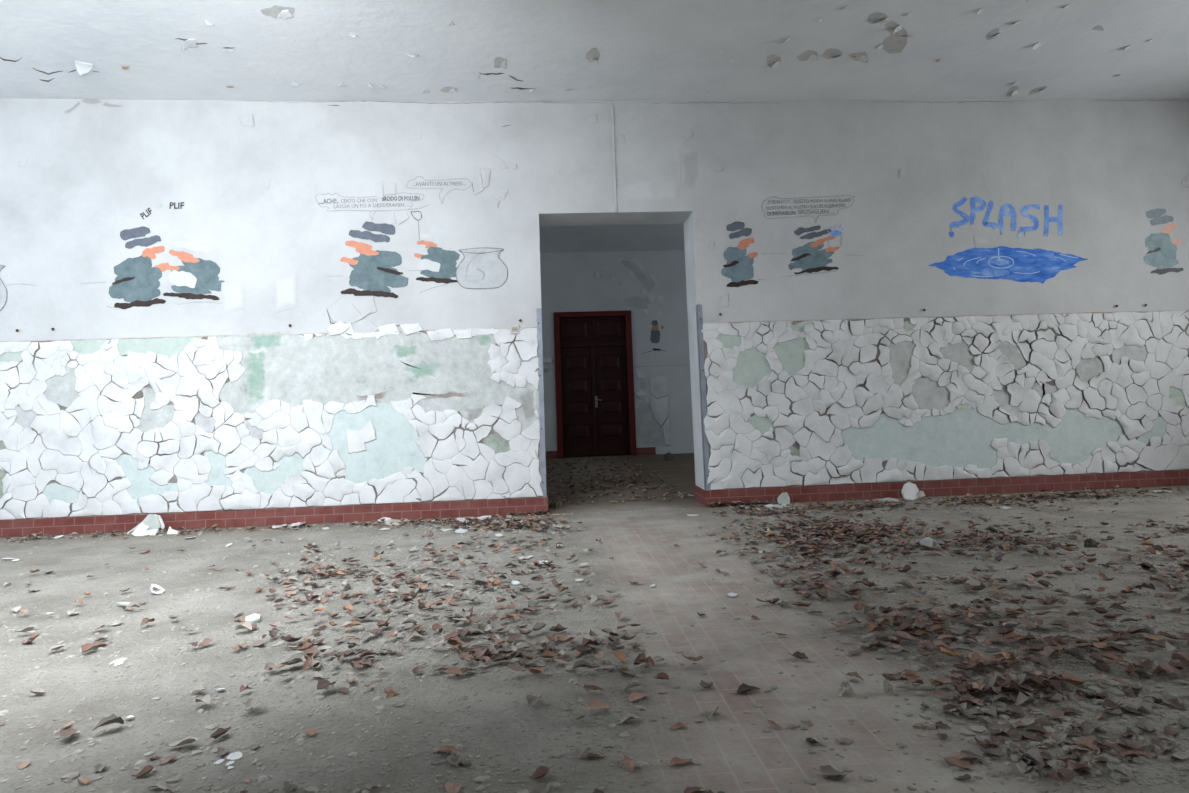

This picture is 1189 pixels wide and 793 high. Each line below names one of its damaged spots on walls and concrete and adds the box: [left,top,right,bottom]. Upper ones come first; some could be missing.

peeling [261,5,295,20]
peeling [797,12,912,63]
peeling [0,329,540,520]
peeling [635,368,670,446]
peeling [701,312,1189,484]